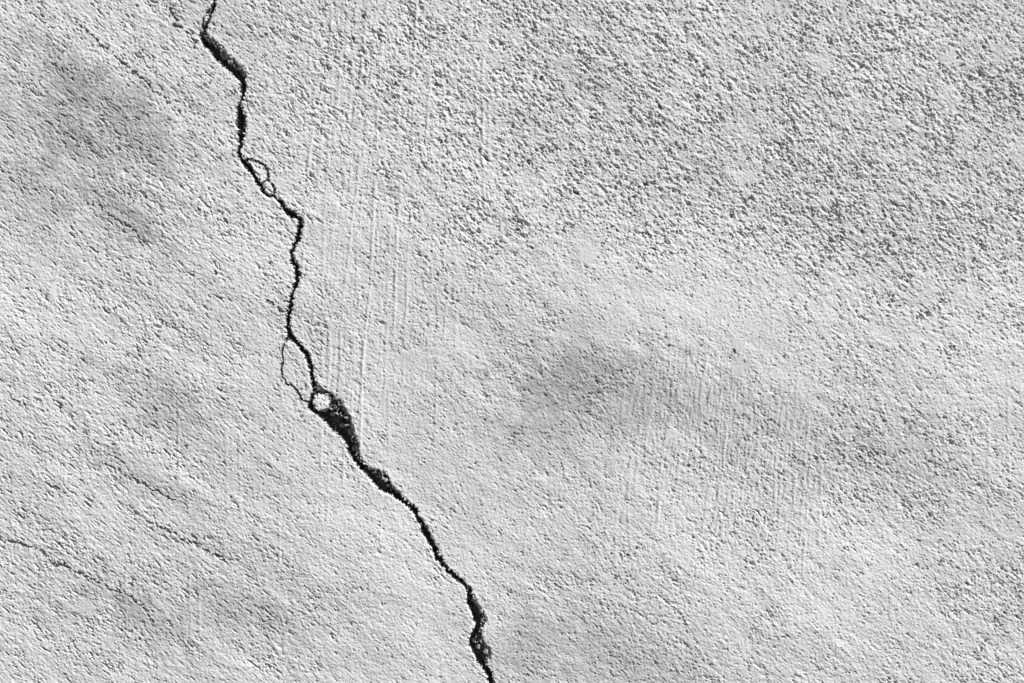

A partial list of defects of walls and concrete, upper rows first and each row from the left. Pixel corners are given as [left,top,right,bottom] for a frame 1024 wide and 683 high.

crack [168,0,368,474]
crack [394,489,476,622]
crack [475,654,495,683]